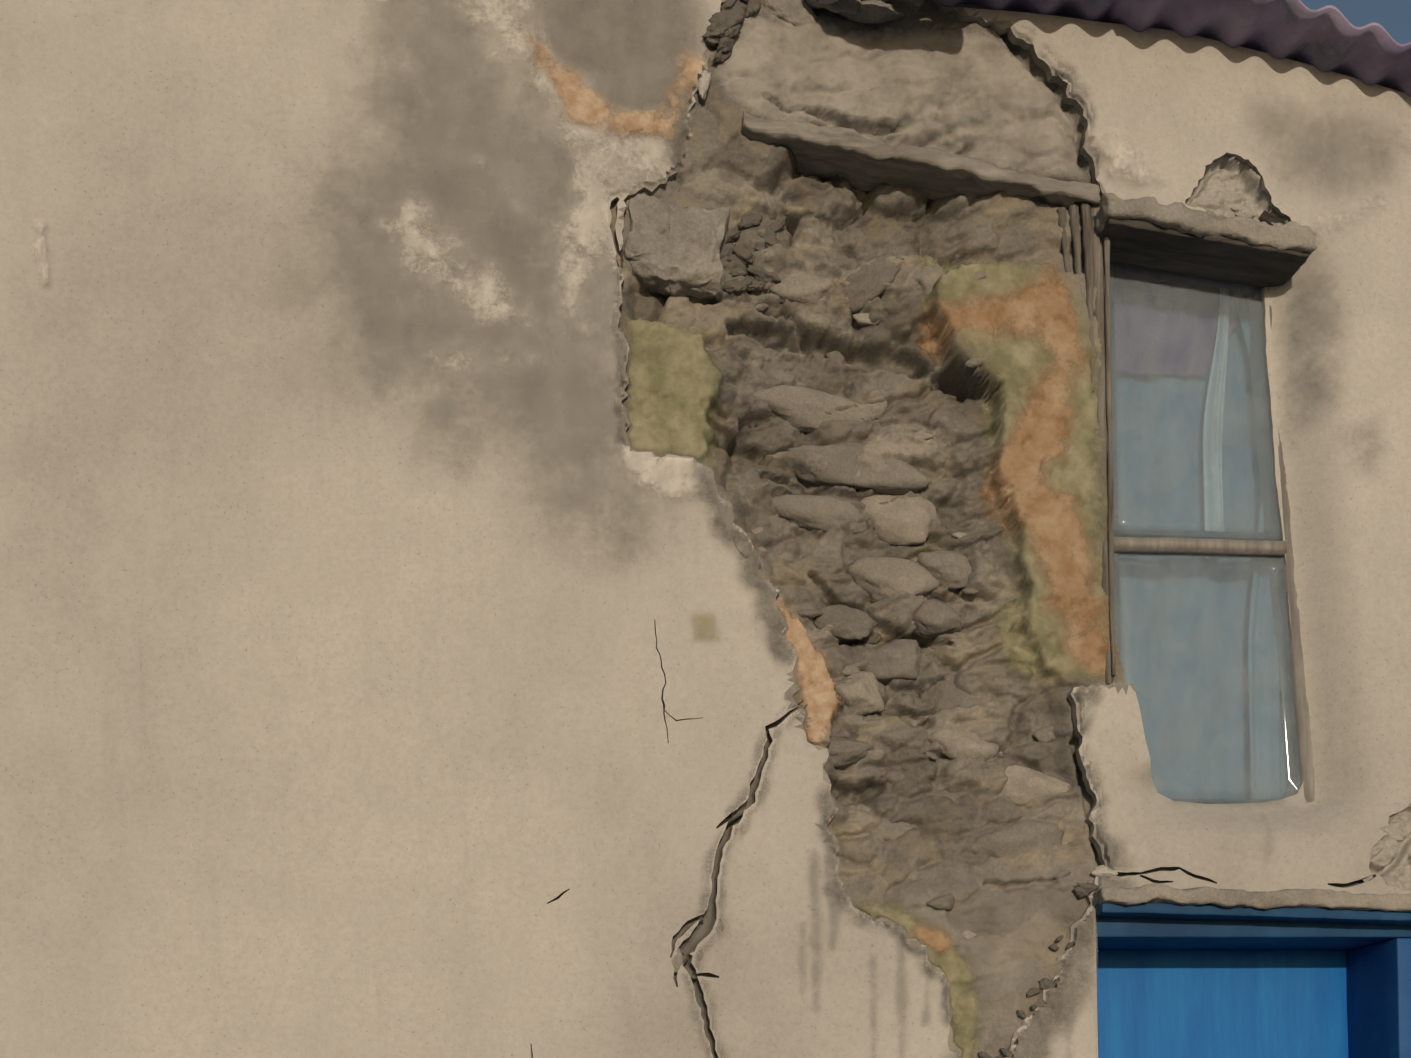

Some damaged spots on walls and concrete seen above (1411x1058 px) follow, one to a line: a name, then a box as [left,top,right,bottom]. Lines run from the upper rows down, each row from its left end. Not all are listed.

corrosion [531,40,707,140]
spalling [1185,155,1289,226]
water stain [345,0,720,497]
corrosion [920,267,1109,674]
spalling [462,0,1149,1058]
crack [654,622,681,721]
corrosion [776,597,841,744]
crack [670,700,807,1058]
crack [1117,867,1212,883]
crack [1328,879,1365,888]
spalling [1362,805,1411,891]